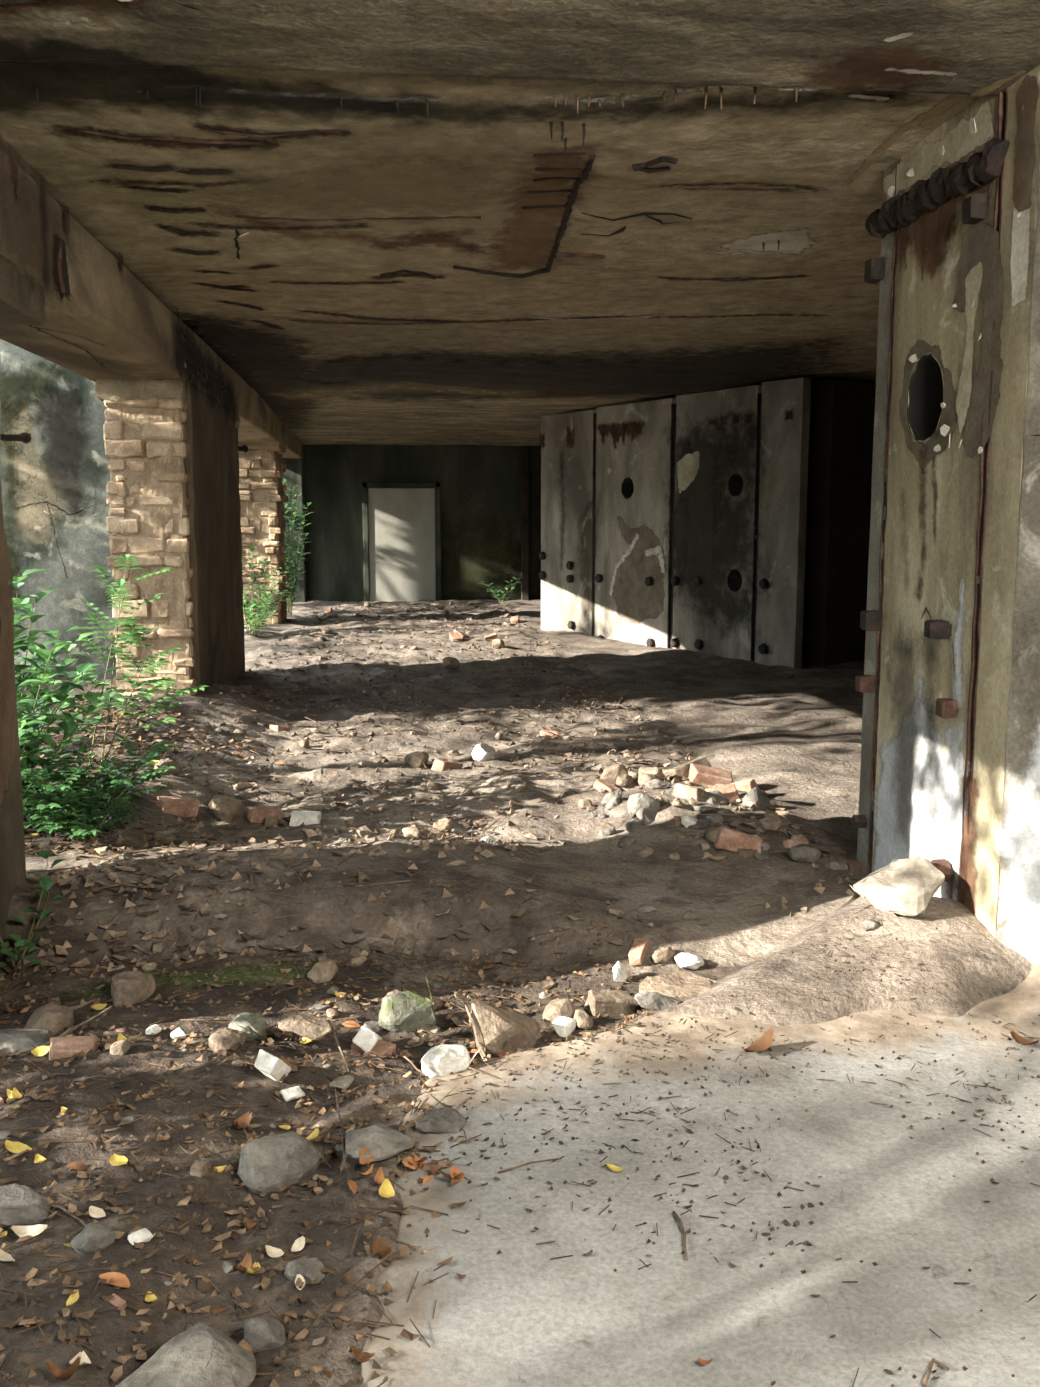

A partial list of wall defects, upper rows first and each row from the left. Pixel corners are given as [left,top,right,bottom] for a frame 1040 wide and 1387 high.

spalling [371,121,605,280]
rust [597,421,645,448]
peeling [677,447,700,494]
rust [903,447,937,599]